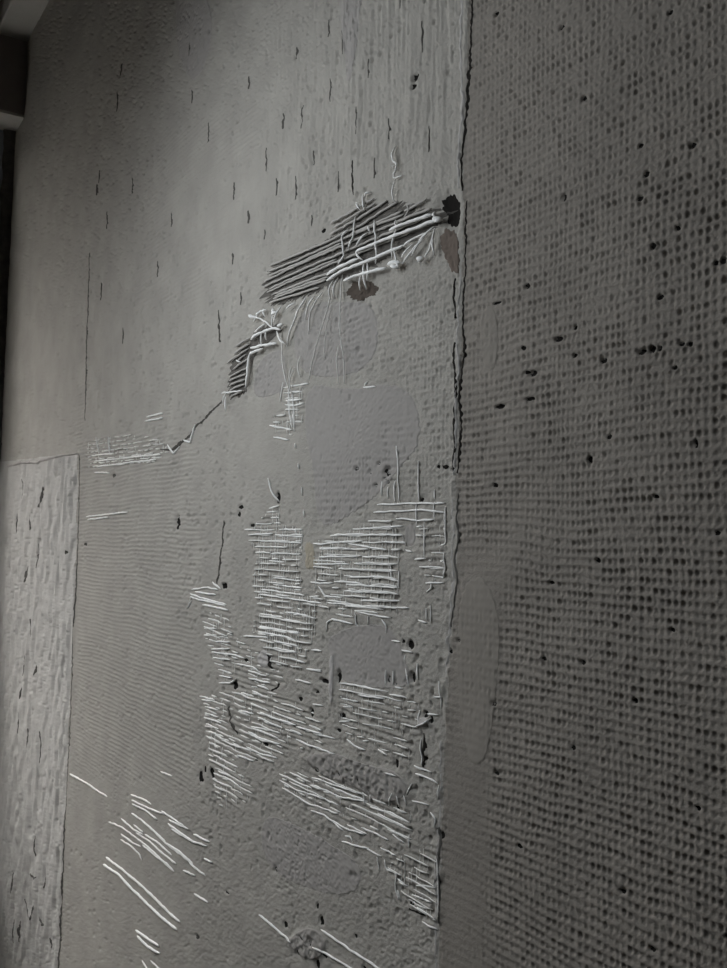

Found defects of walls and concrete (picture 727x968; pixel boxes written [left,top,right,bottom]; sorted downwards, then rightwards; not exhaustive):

flaking render [442,194,461,227]
crack [450,0,473,627]
crack [160,400,222,451]
flaking render [316,655,342,703]
flaking render [306,753,408,809]
flaking render [284,903,328,968]